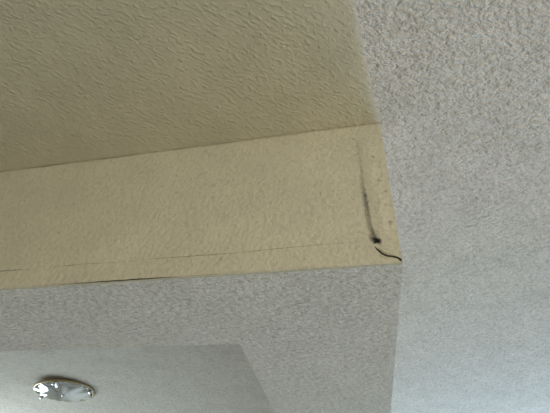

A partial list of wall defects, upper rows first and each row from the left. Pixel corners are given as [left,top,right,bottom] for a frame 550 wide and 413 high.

crack [375,247,402,261]